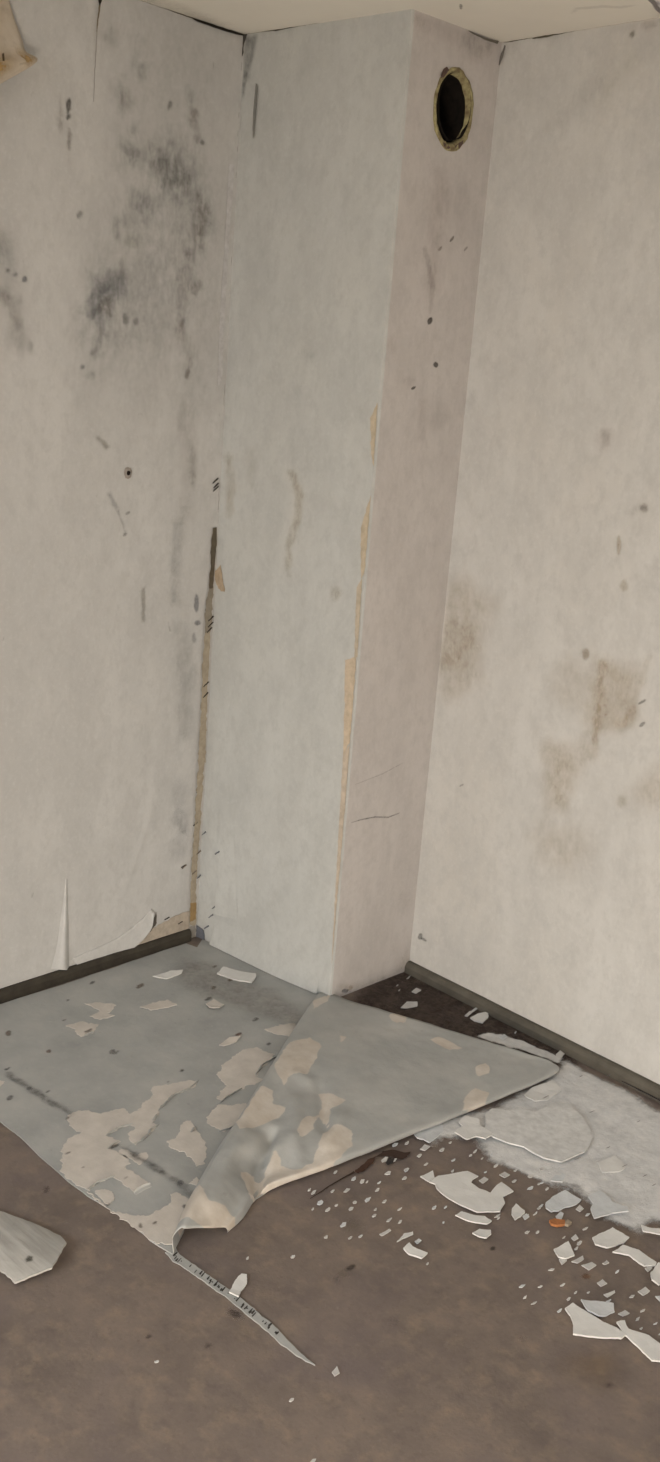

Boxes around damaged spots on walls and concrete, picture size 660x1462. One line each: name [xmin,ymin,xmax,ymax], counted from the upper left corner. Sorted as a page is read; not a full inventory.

peeling [0,0,38,84]
peeling [72,906,215,965]